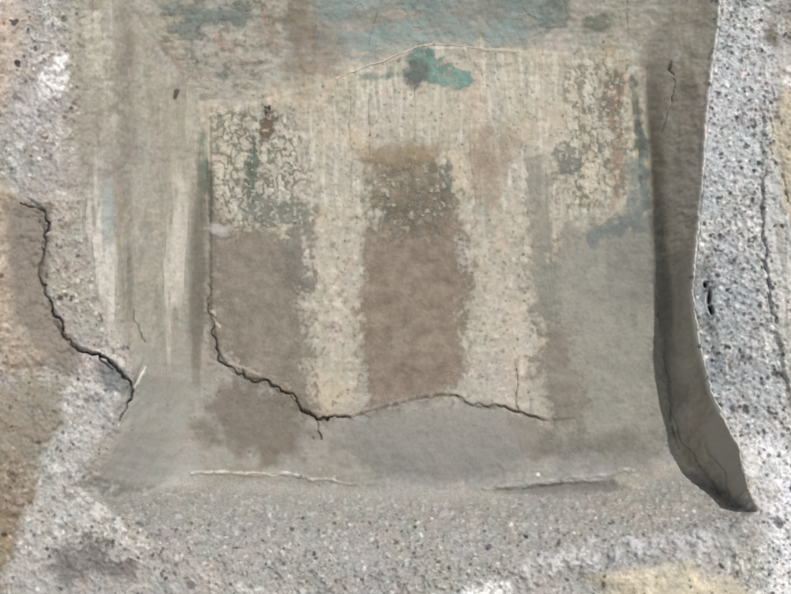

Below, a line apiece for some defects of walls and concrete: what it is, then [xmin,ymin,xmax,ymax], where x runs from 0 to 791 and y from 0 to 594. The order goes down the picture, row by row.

crack [43,285,133,403]
leakage [163,70,321,416]
peeling [209,111,318,236]
crack [242,374,350,421]
leakage [353,155,475,417]
peeling [554,65,627,204]